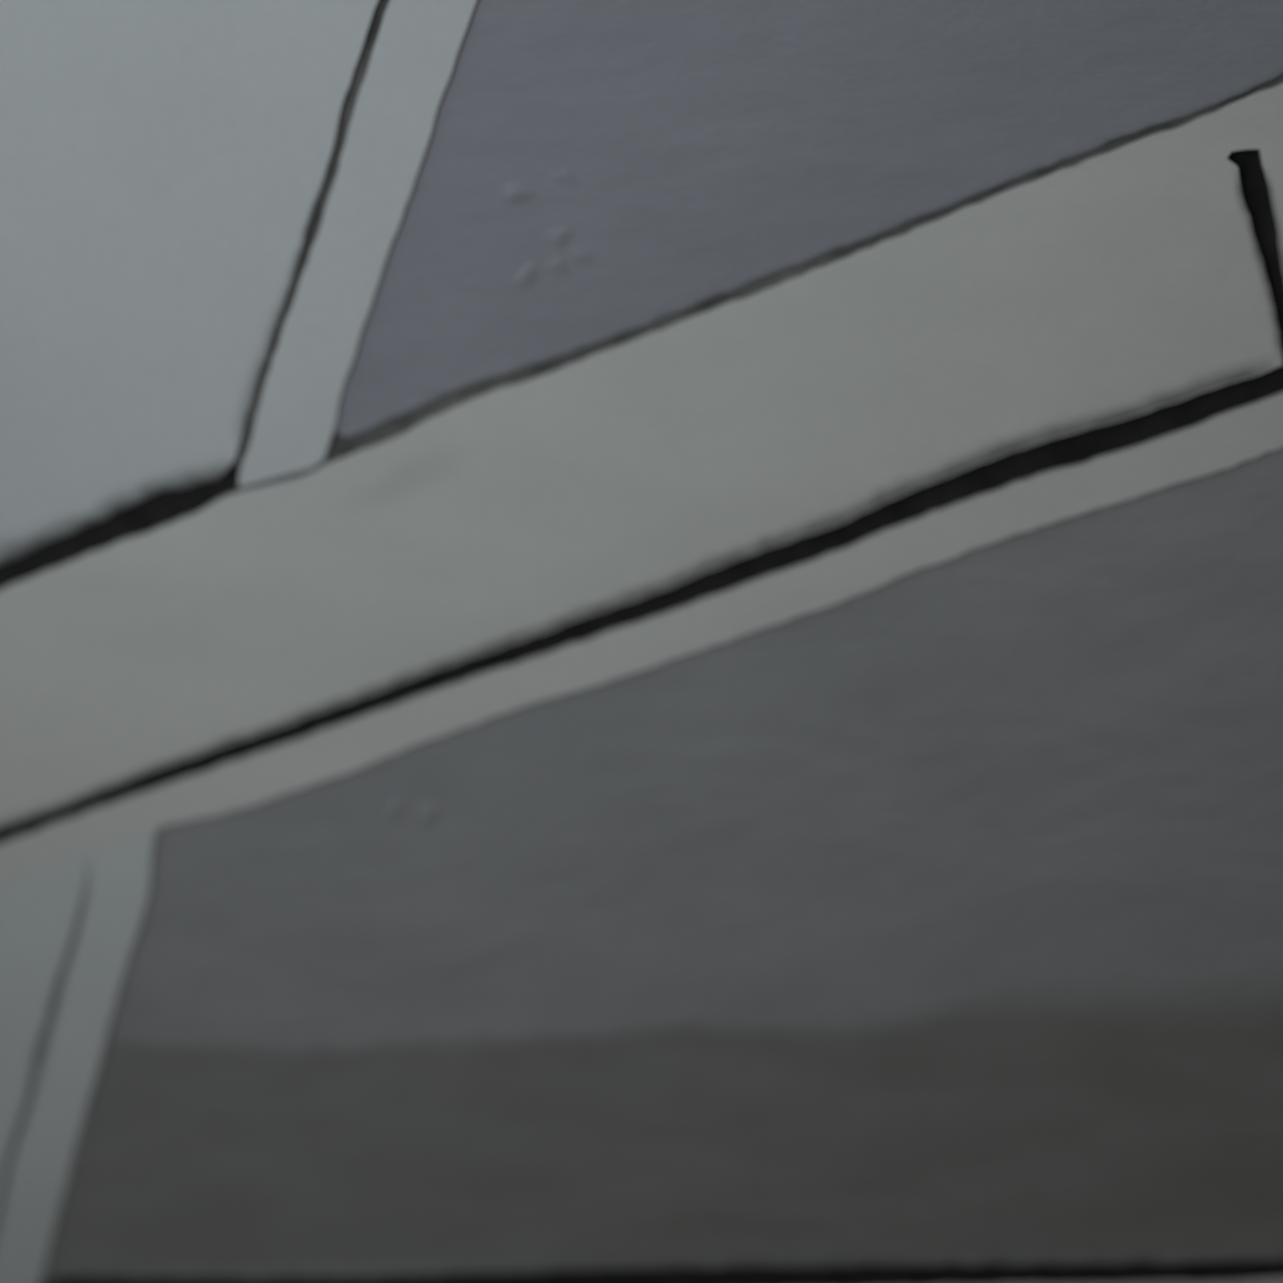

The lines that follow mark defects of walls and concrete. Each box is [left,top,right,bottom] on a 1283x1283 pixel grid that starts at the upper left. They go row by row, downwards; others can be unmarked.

crack [0,0,1283,843]